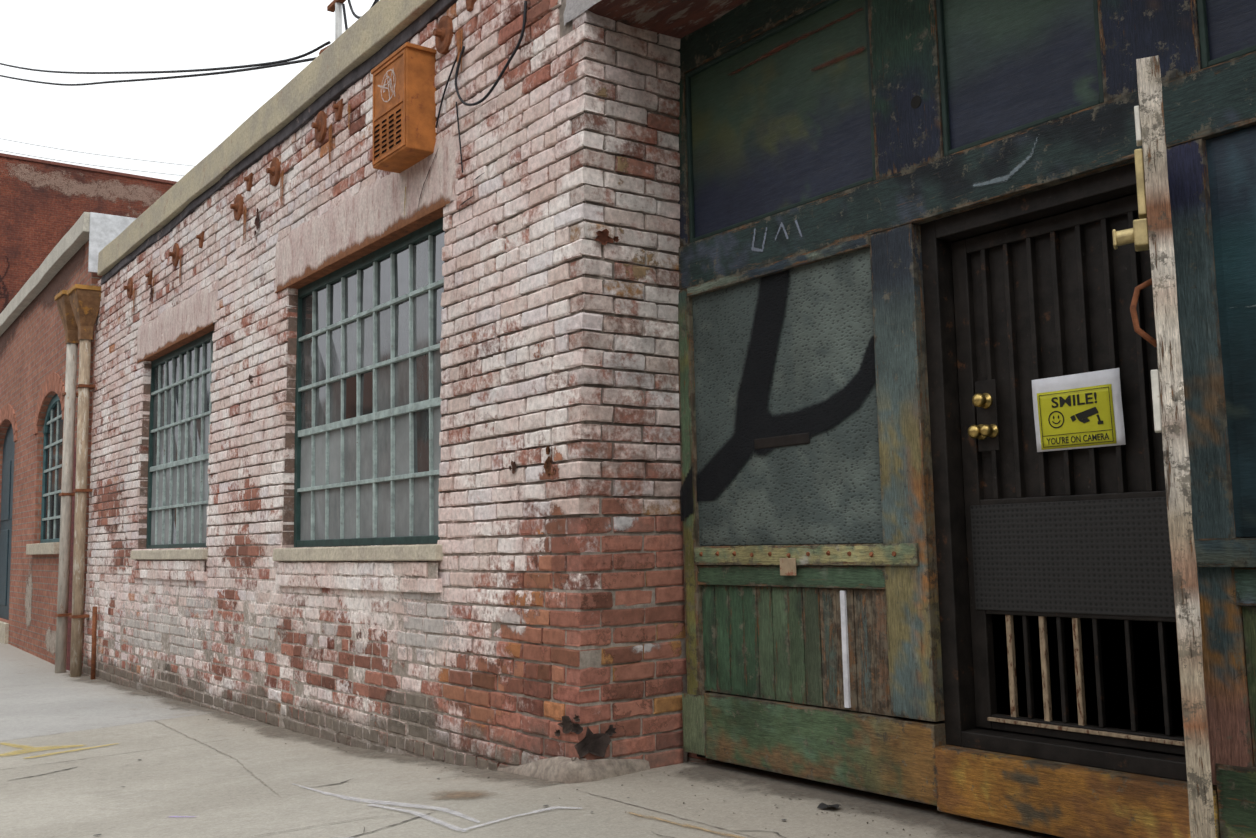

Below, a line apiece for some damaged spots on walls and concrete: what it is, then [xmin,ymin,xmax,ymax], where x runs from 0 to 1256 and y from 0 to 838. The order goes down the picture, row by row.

peeling [243,474,260,517]
peeling [93,475,131,572]
peeling [222,535,266,574]
peeling [217,589,240,620]
peeling [208,658,226,681]
peeling [274,619,306,661]
peeling [306,599,404,724]
peeling [438,494,685,761]